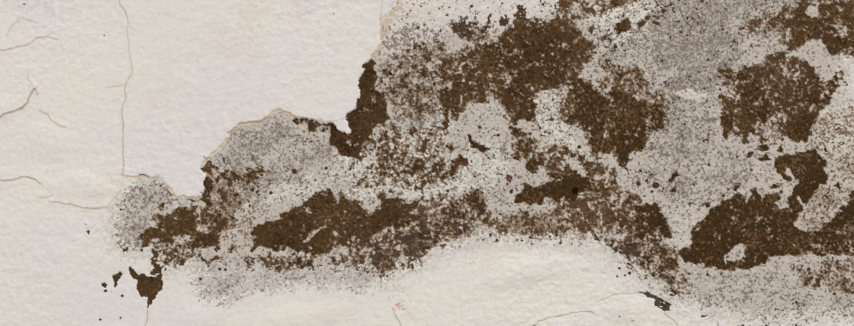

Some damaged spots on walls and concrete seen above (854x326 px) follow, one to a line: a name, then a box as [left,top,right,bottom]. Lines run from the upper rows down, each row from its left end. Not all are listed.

peeling [658,0,702,53]
crack [0,0,202,209]
peeling [503,222,554,248]